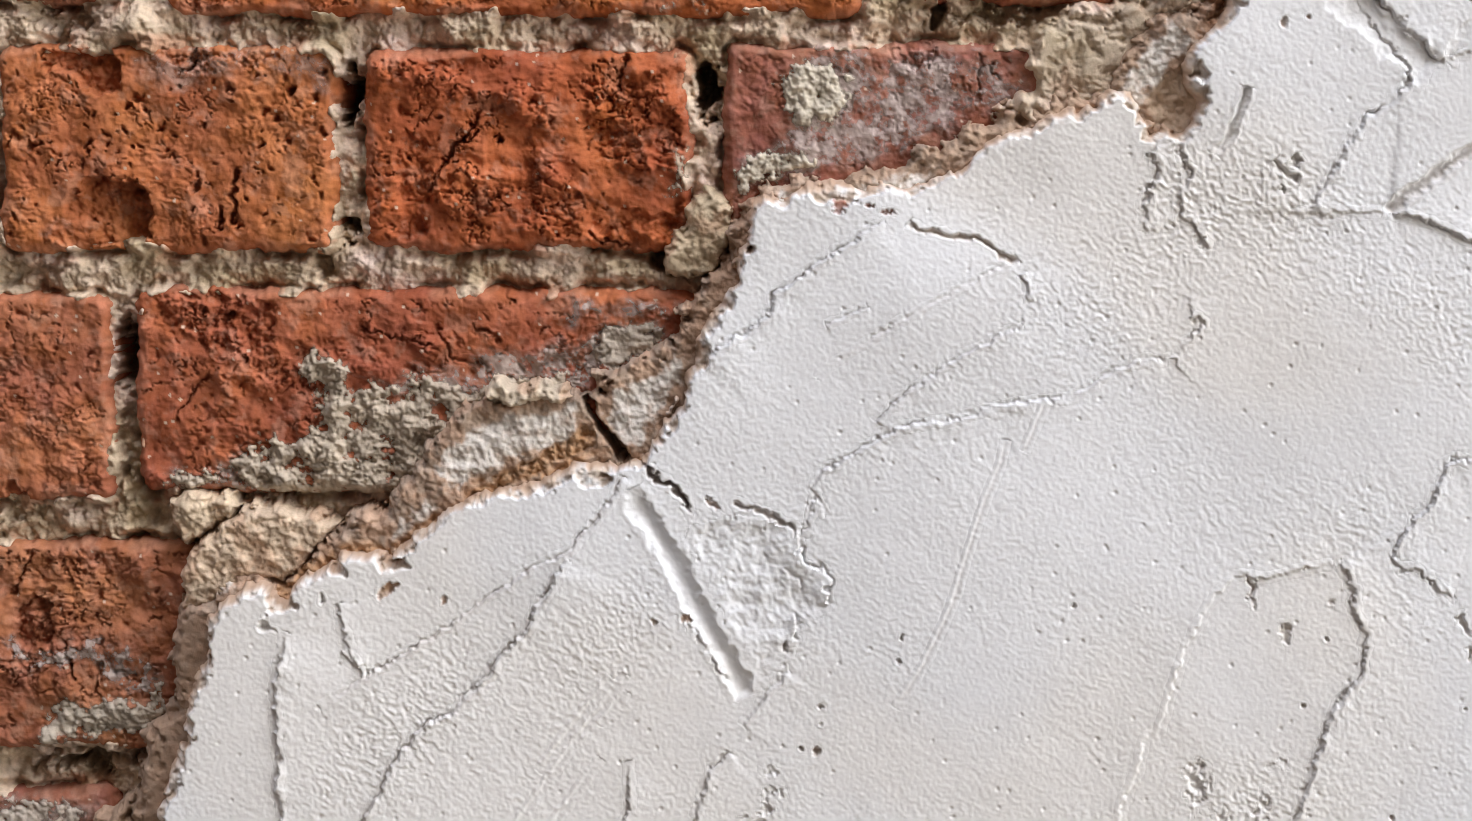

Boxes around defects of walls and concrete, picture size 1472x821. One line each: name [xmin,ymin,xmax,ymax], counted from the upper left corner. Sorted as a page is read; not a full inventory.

spalling [33,43,151,120]
spalling [42,138,158,250]
crack [211,167,247,233]
peeling [733,149,817,195]
crack [1135,137,1214,253]
crack [1270,152,1308,194]
crack [904,218,1038,304]
spalling [144,285,286,369]
crack [358,285,521,369]
spalling [488,420,600,489]
crack [315,390,837,714]
spalling [616,481,836,705]